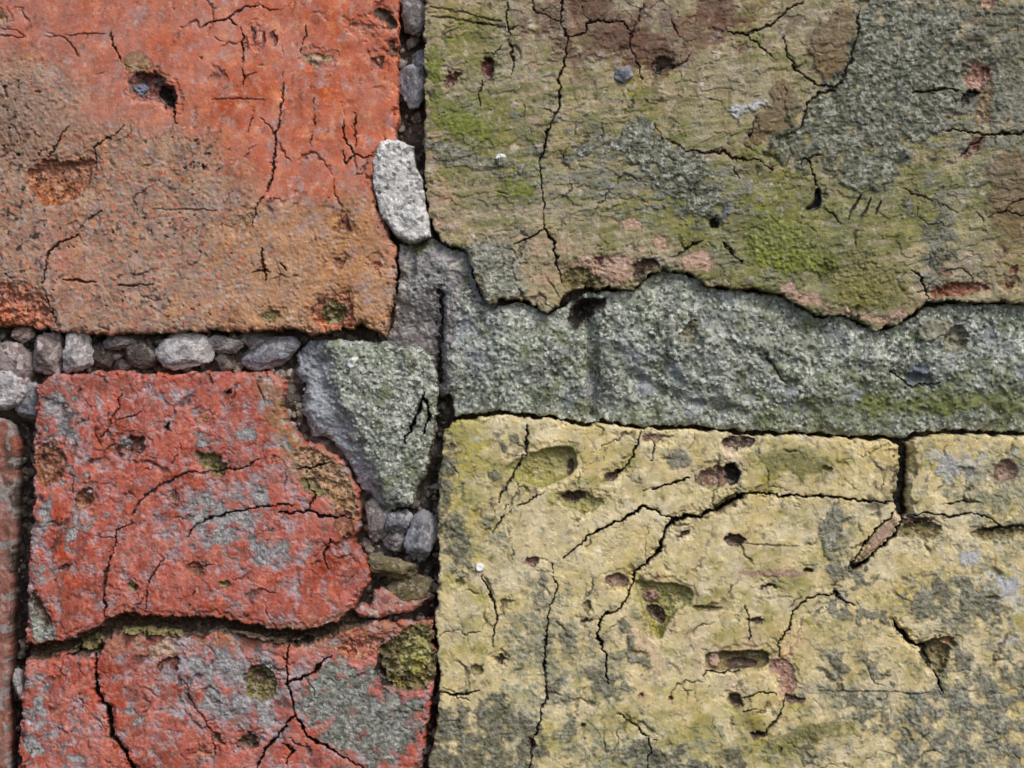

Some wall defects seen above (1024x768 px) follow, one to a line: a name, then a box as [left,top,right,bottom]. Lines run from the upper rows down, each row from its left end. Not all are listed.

spalling [122,51,176,109]
crack [203,5,275,85]
crack [248,85,284,224]
crack [480,0,644,283]
crack [654,118,773,178]
crack [731,3,861,136]
crack [941,129,1024,155]
crack [404,289,445,444]
crack [26,455,374,768]
crack [528,443,1000,768]
spalling [850,516,941,569]
spalling [917,634,958,674]